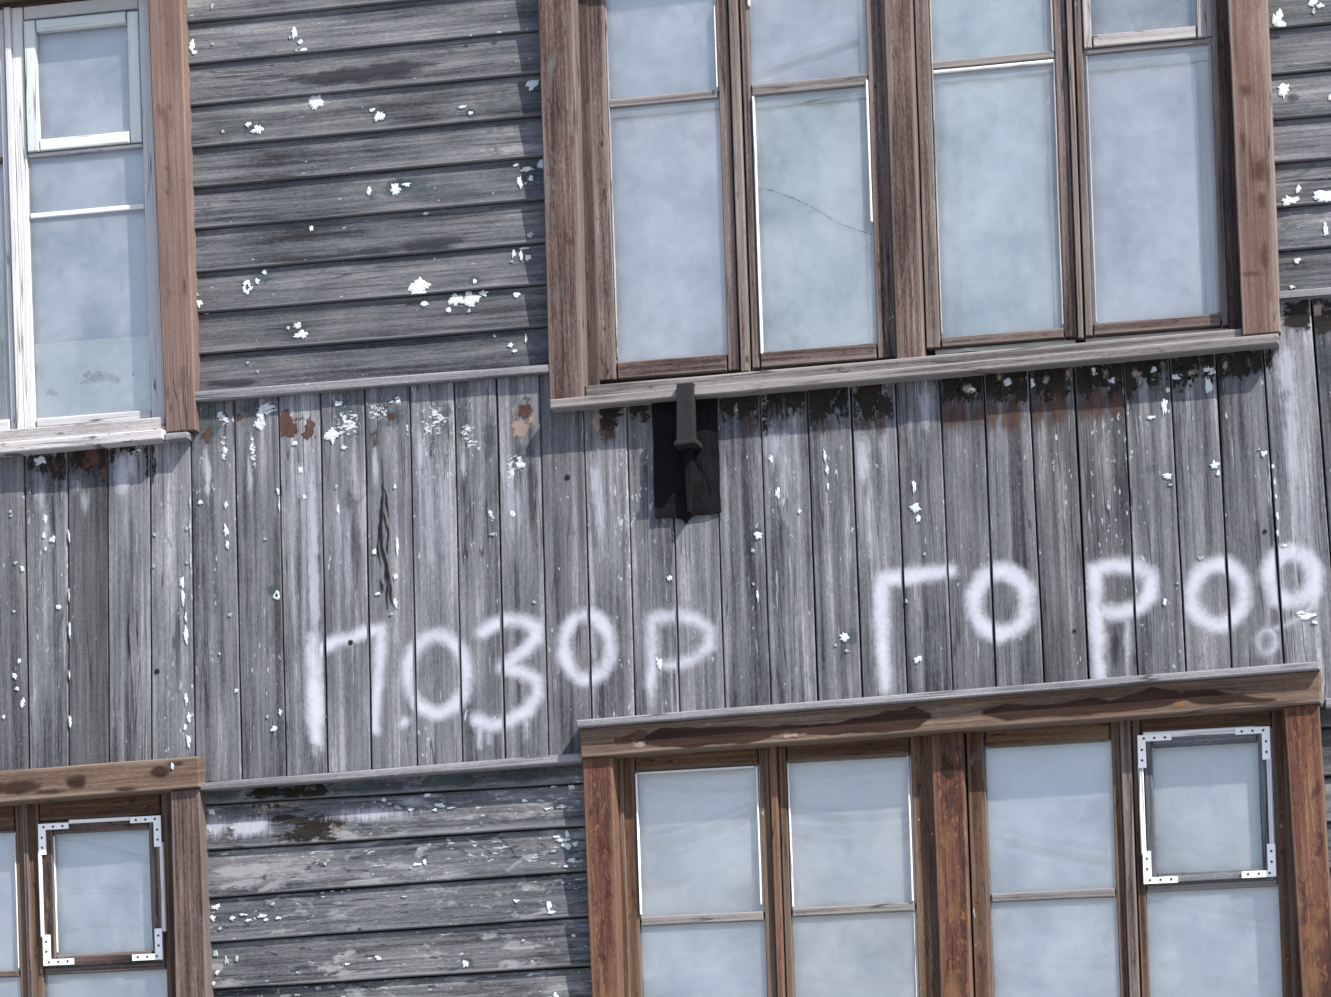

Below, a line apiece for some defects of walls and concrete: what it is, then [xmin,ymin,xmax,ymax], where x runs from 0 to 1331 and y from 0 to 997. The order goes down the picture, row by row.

peeling [408,277,431,307]
peeling [446,277,488,313]
leakage [919,380,930,430]
peeling [323,396,493,483]
leakage [114,451,136,495]
peeling [185,400,277,536]
peeling [507,448,527,478]
crack [376,483,393,609]
peeling [373,793,457,811]
peeling [549,830,579,868]
peeling [210,902,281,930]
peeling [212,950,239,986]